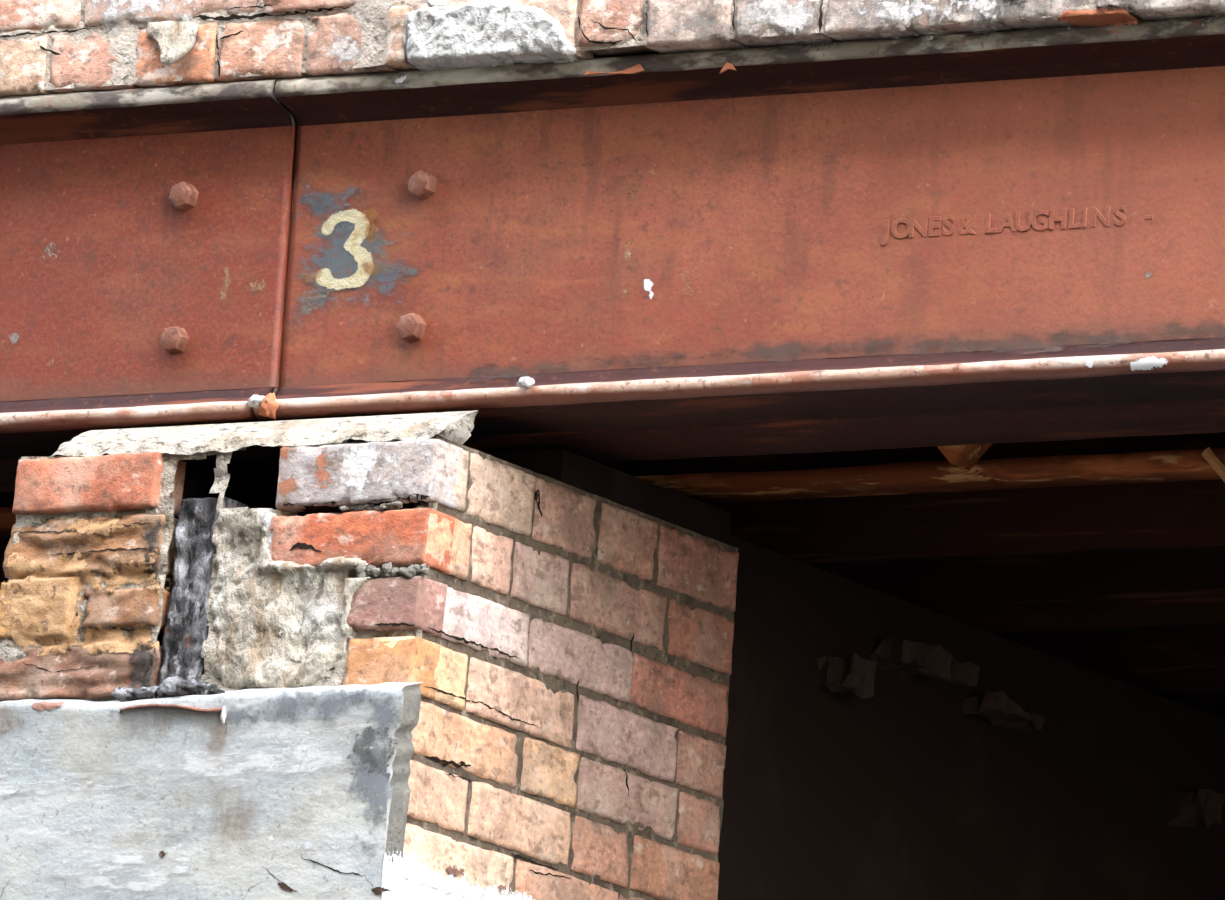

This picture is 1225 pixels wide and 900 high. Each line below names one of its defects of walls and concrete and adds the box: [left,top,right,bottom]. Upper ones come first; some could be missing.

peeling [230,595,323,663]
crack [301,857,373,887]